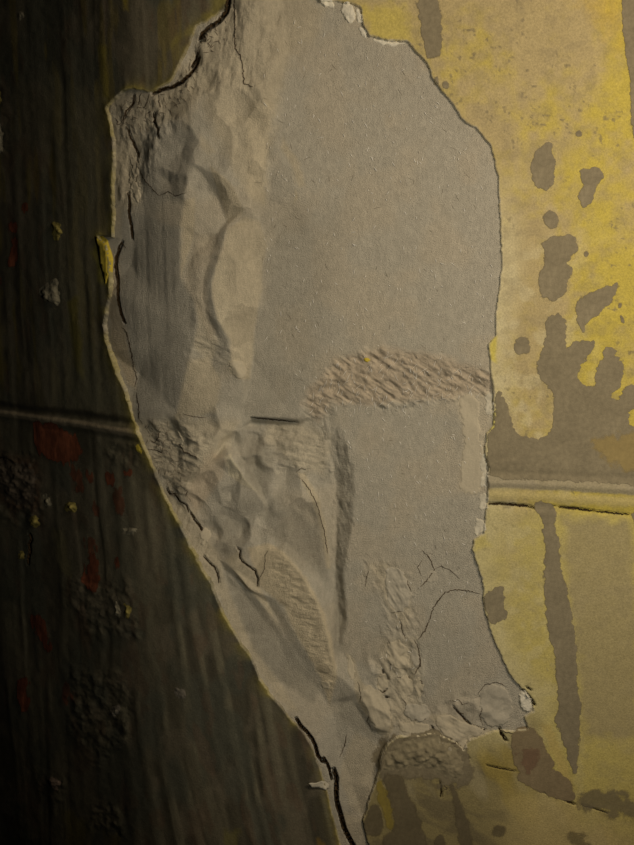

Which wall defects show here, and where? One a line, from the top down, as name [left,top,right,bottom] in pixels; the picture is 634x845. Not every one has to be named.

peeling [622,0,634,135]
crack [114,0,253,459]
peeling [578,167,604,208]
peeling [576,282,625,332]
spalling [95,0,589,845]
peeling [486,313,634,486]
crack [489,501,534,509]
crack [554,505,629,515]
crack [382,550,480,730]
crack [455,682,513,741]
crack [296,718,354,845]
peeling [577,790,634,818]